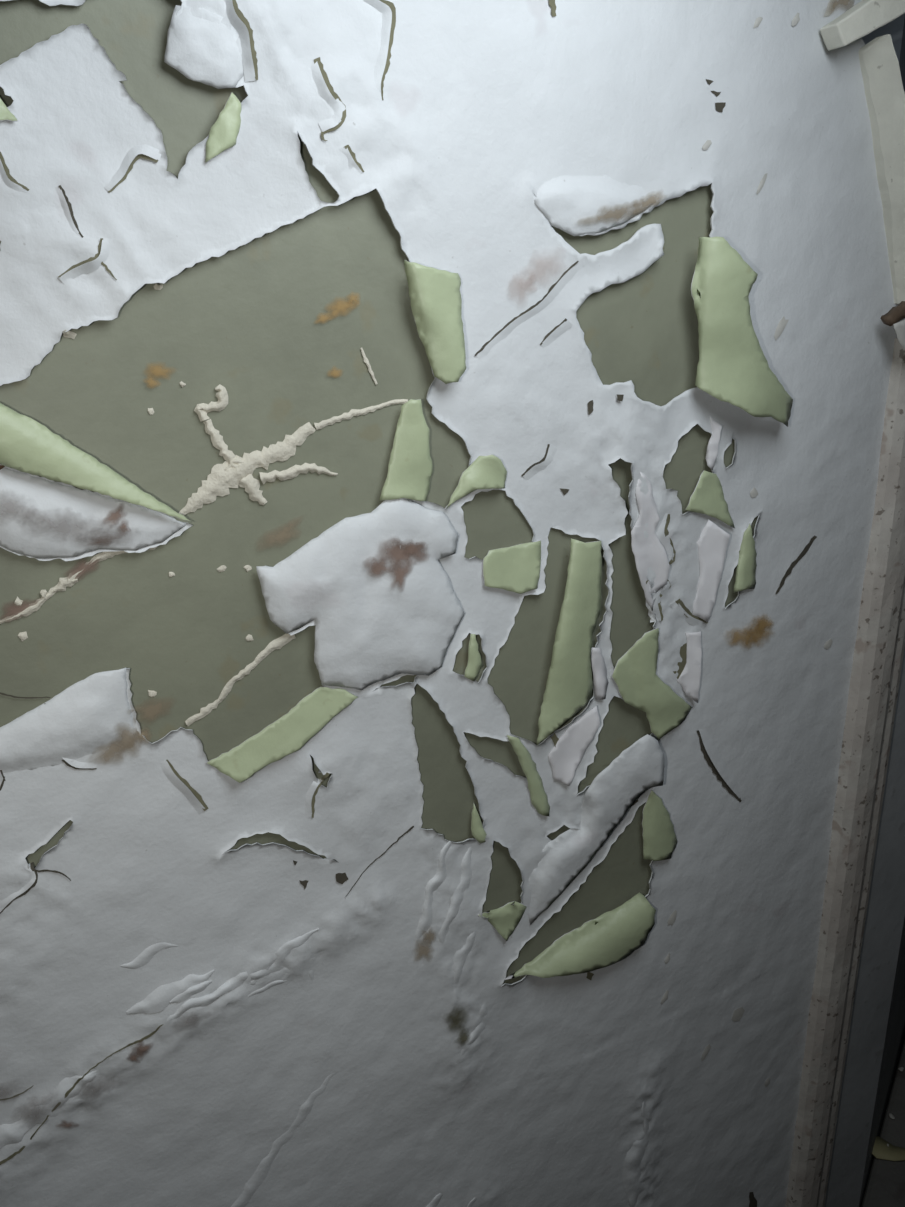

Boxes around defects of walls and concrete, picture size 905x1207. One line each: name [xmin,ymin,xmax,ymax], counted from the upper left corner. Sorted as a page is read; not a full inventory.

peeling [0,0,246,179]
crack [311,57,364,174]
crack [363,0,396,100]
damp [3,602,35,618]
rust [366,542,426,587]
peeling [0,144,793,941]
rust [732,618,772,644]
crack [697,728,747,802]
peeling [504,790,677,981]